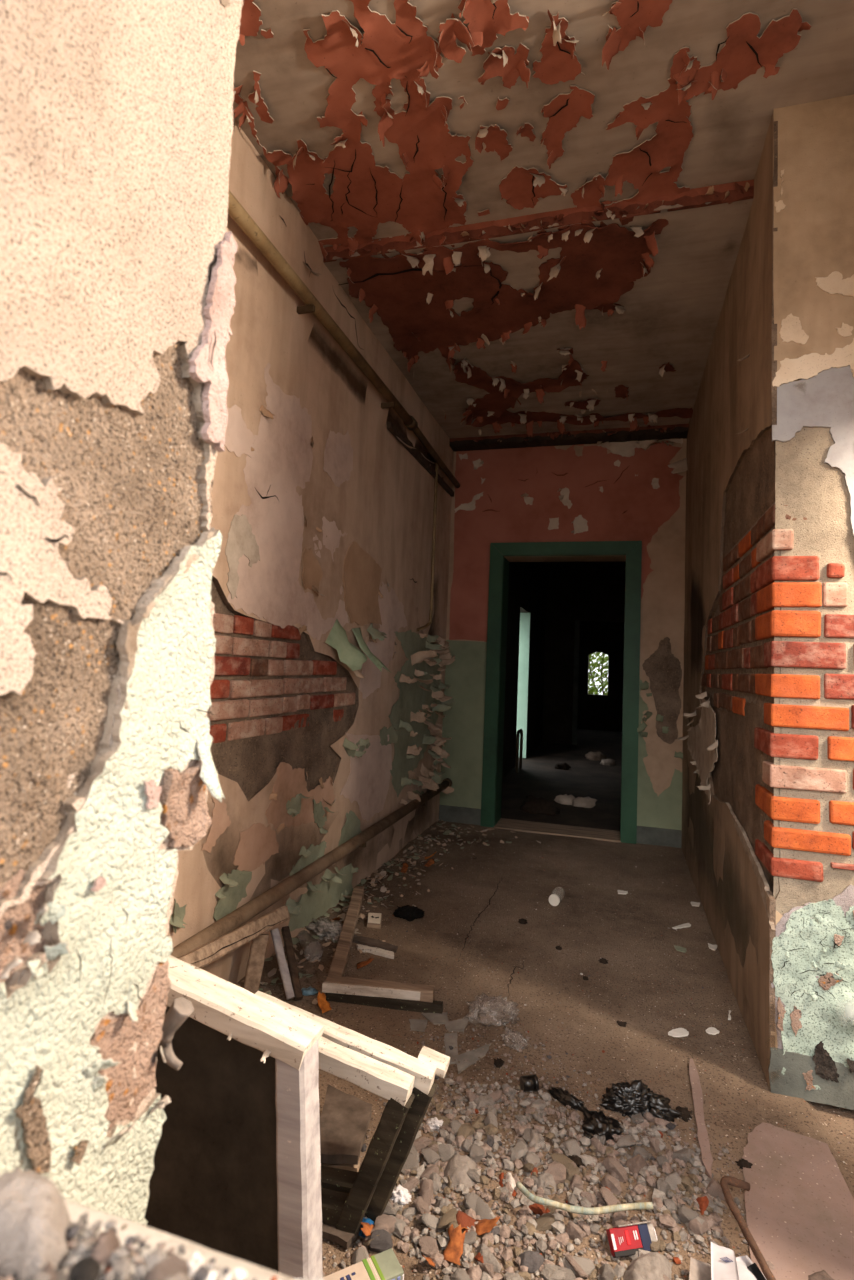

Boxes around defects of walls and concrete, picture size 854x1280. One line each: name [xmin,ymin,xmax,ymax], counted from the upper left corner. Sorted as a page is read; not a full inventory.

peeling [0,231,455,1226]
peeling [454,453,485,513]
peeling [233,0,812,489]
peeling [548,488,588,534]
flaking render [637,427,854,1091]